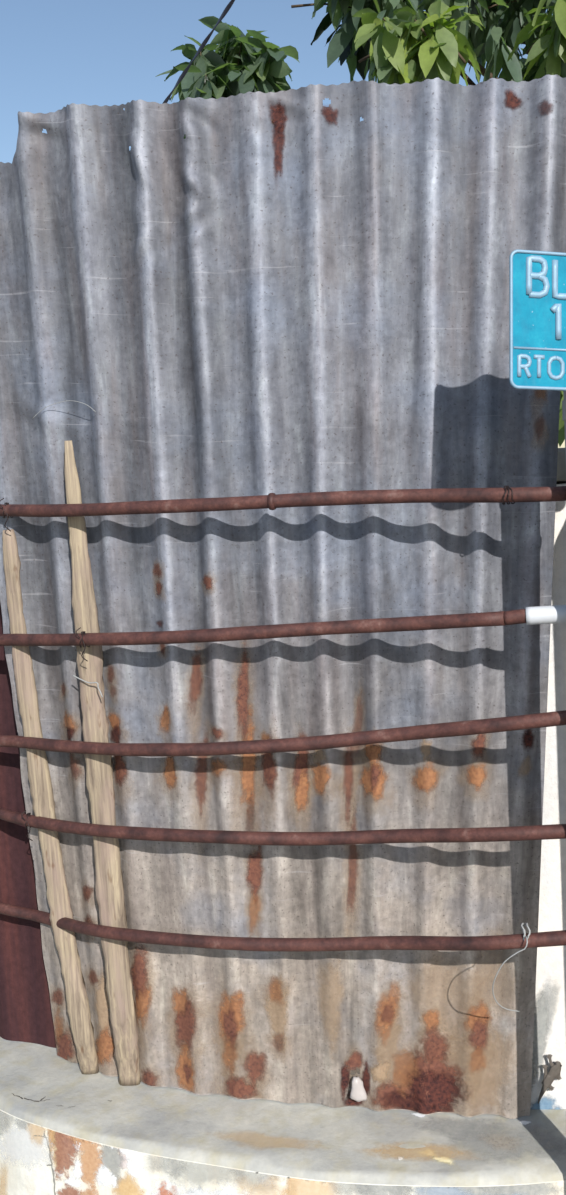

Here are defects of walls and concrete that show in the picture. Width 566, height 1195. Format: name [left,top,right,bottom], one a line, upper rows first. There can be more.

rust [270,104,287,173]
rust [505,90,521,109]
rust [540,102,551,115]
rust [0,605,566,905]
rust [0,902,566,1022]
rust [173,990,195,1091]
rust [219,993,265,1099]
rust [266,981,287,1049]
rust [376,986,398,1040]
rust [341,1011,462,1114]
peeling [54,1132,275,1195]
peeling [419,1148,452,1164]